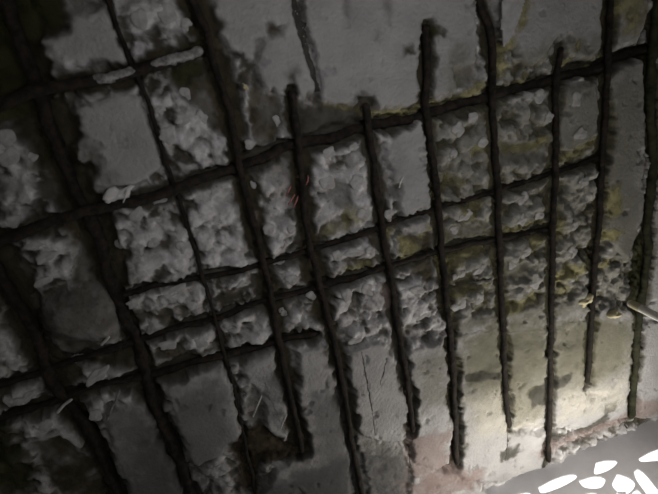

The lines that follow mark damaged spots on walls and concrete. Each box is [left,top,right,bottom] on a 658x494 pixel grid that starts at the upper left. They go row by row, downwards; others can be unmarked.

spalling [0,0,325,494]
corrosion [229,421,301,490]
crack [292,0,320,92]
spalling [288,0,658,494]